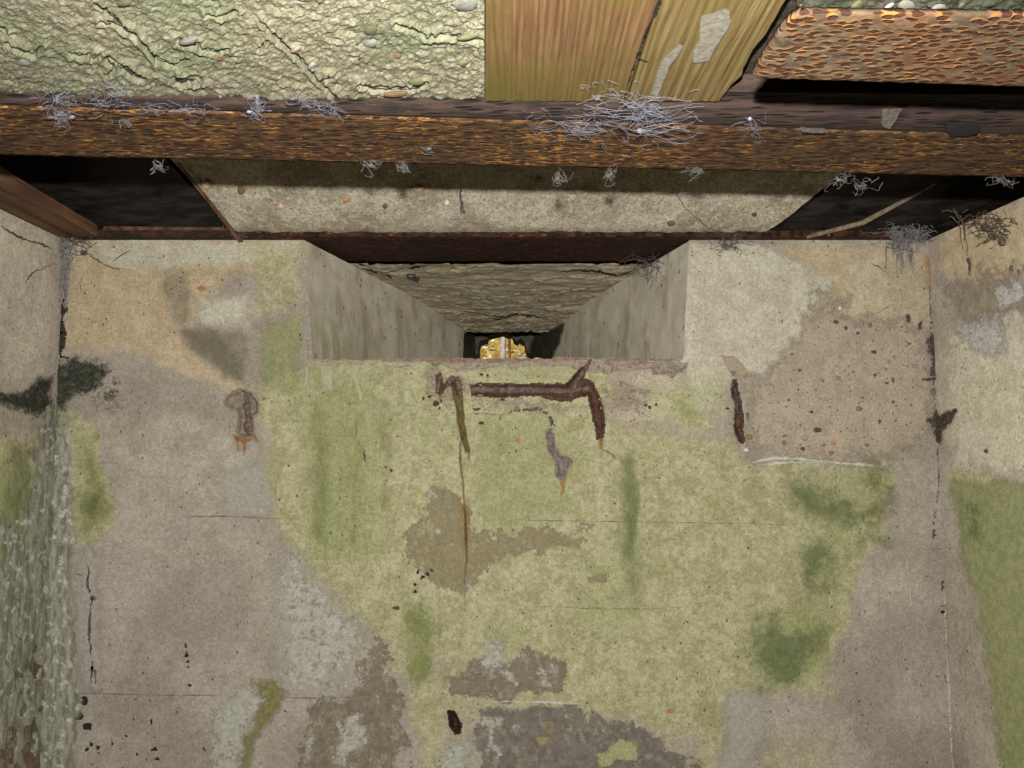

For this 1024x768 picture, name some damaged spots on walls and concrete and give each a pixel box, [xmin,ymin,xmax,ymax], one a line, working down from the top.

spalling [721,286,958,468]
crack [929,286,940,549]
water stain [0,357,120,768]